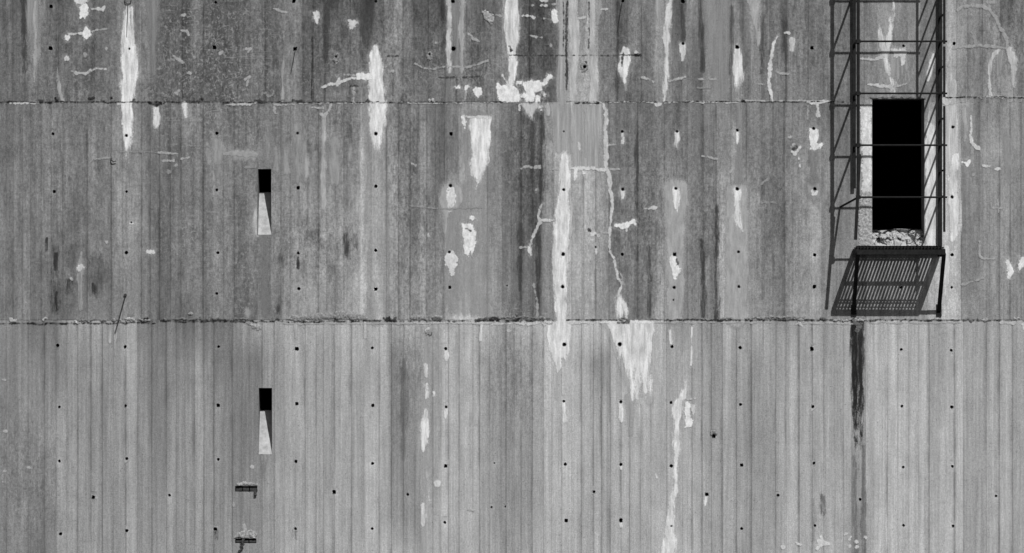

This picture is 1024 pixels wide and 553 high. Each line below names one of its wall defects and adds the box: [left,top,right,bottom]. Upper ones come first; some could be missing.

leakage [120,0,159,169]
leakage [321,0,387,150]
leakage [439,112,492,316]
crack [0,0,1024,325]
efflorescence [501,0,543,86]
leakage [530,0,606,400]
leakage [600,176,690,436]
efflorescence [661,380,696,553]